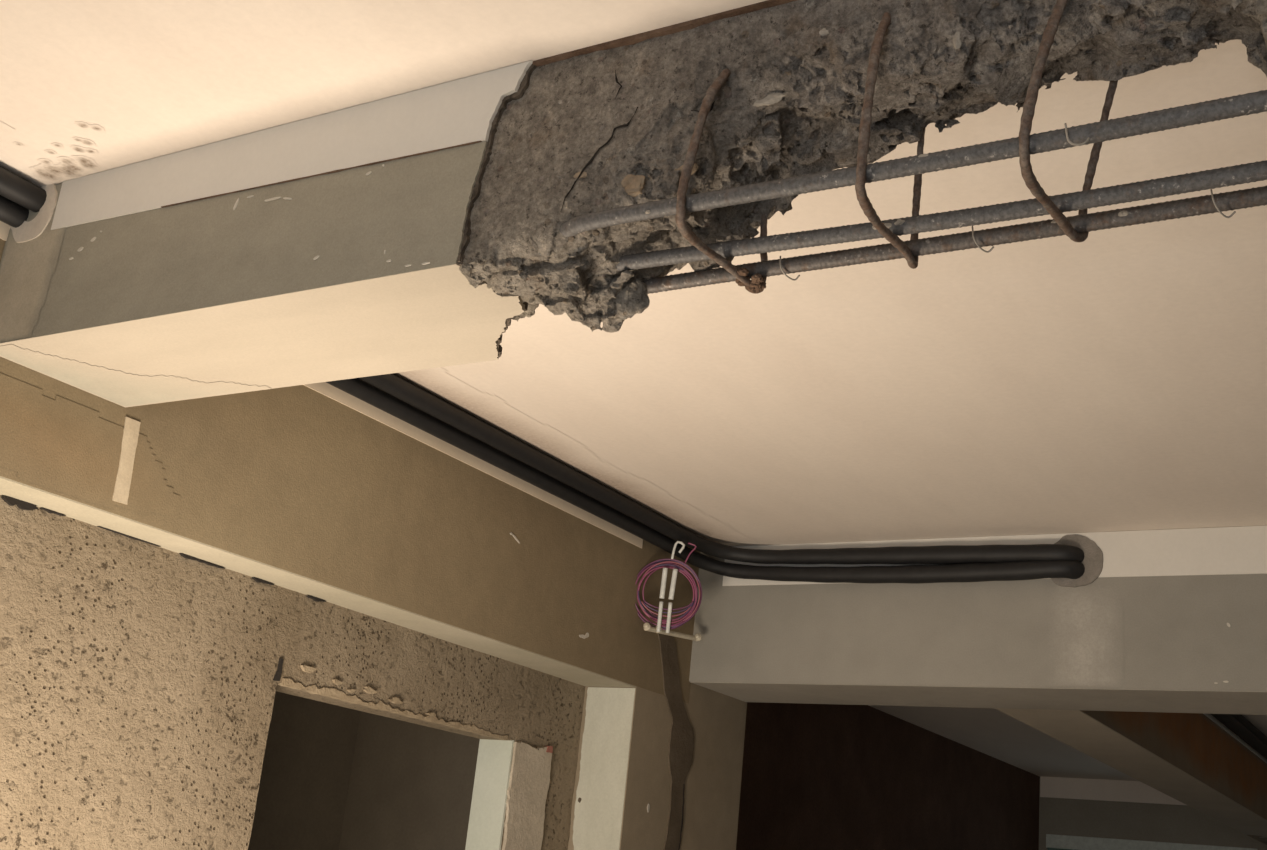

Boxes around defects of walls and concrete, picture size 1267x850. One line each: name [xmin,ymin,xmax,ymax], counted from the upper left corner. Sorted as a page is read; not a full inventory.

leakage [30,121,104,183]
spalling [456,0,1267,357]